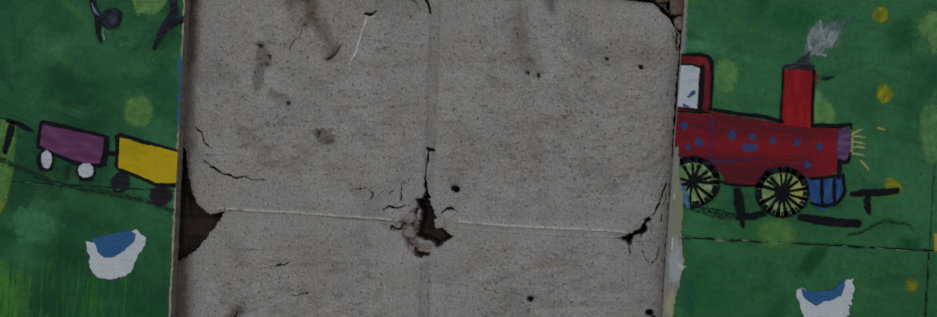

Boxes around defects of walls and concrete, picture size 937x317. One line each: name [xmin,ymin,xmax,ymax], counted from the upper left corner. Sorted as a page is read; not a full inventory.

crack [630,0,682,156]
crack [196,127,265,180]
crack [360,147,455,230]
spalling [400,209,420,254]